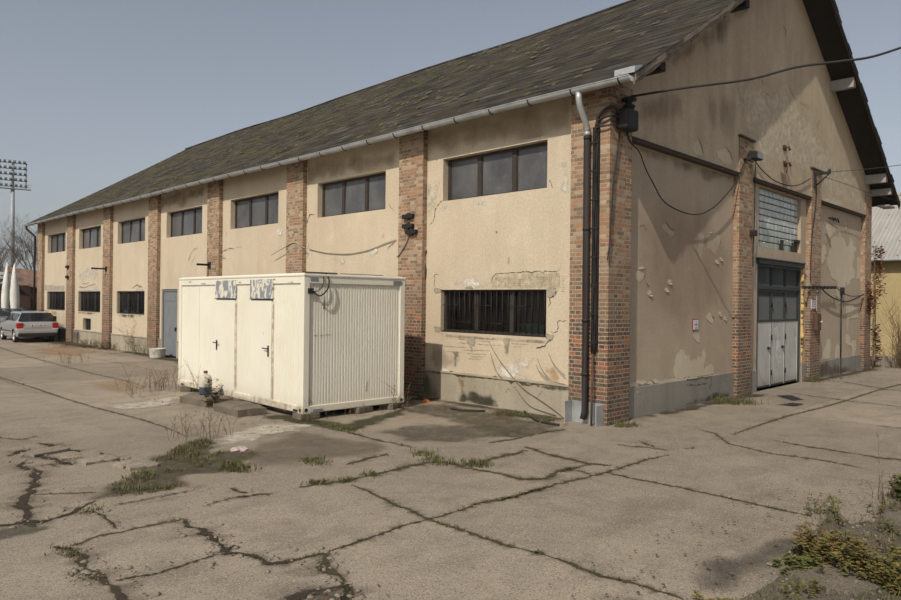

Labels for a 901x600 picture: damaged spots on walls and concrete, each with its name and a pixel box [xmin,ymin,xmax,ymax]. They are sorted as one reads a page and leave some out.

peeling [821,221,861,360]
peeling [630,330,719,388]
crack [0,436,180,528]
crack [207,488,275,505]
crack [55,520,355,600]